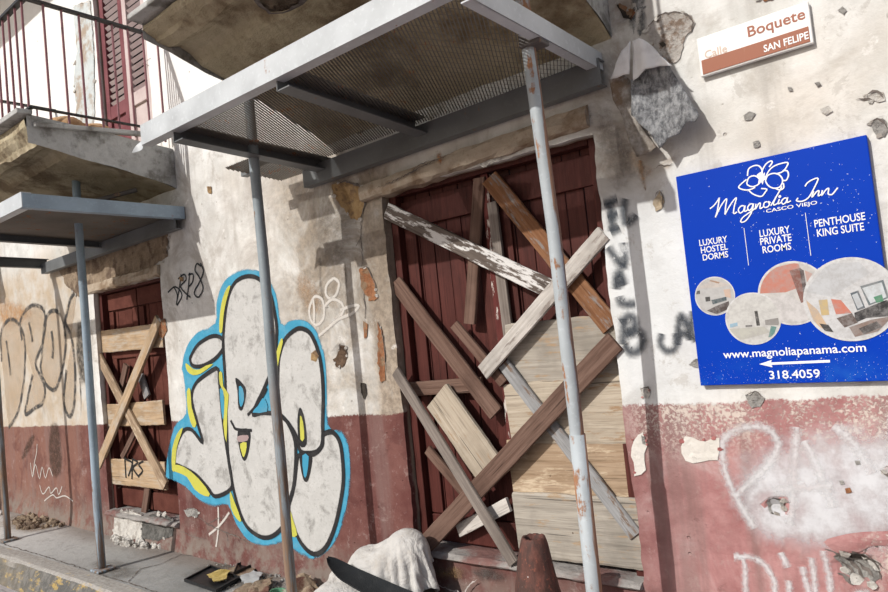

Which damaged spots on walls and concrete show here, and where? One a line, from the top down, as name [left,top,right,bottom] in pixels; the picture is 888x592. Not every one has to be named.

spalling [254,0,307,14]
spalling [642,11,695,63]
spalling [856,90,885,104]
spalling [867,118,888,138]
spalling [331,180,366,222]
spalling [359,266,379,301]
spalling [333,344,348,369]
spalling [745,391,764,408]
spalling [833,550,881,590]